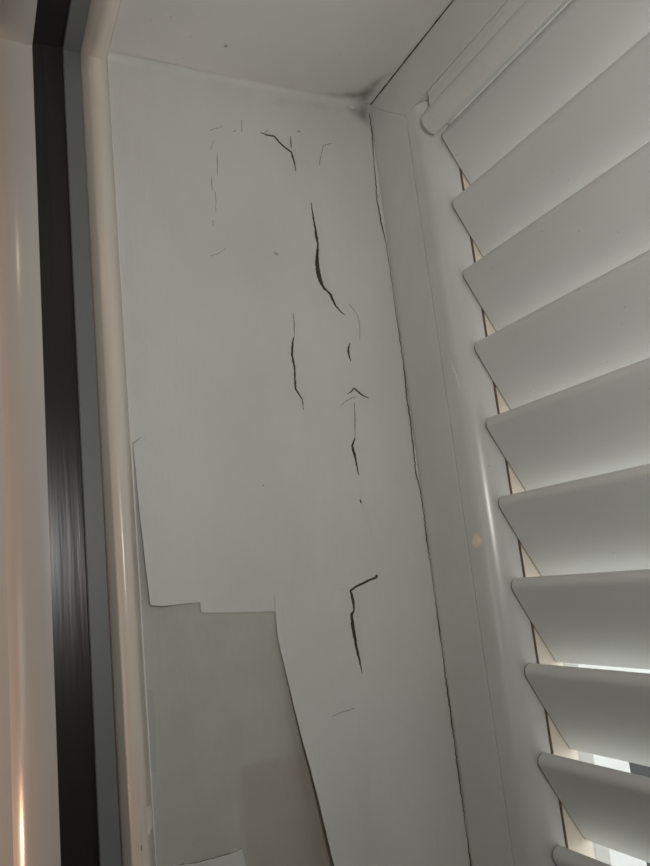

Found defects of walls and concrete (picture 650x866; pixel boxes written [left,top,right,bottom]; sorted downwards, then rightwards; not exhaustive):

crack [210,120,331,226]
crack [311,203,360,361]
crack [291,316,310,410]
crack [338,382,369,414]
crack [350,438,386,673]
peeling [132,436,378,866]